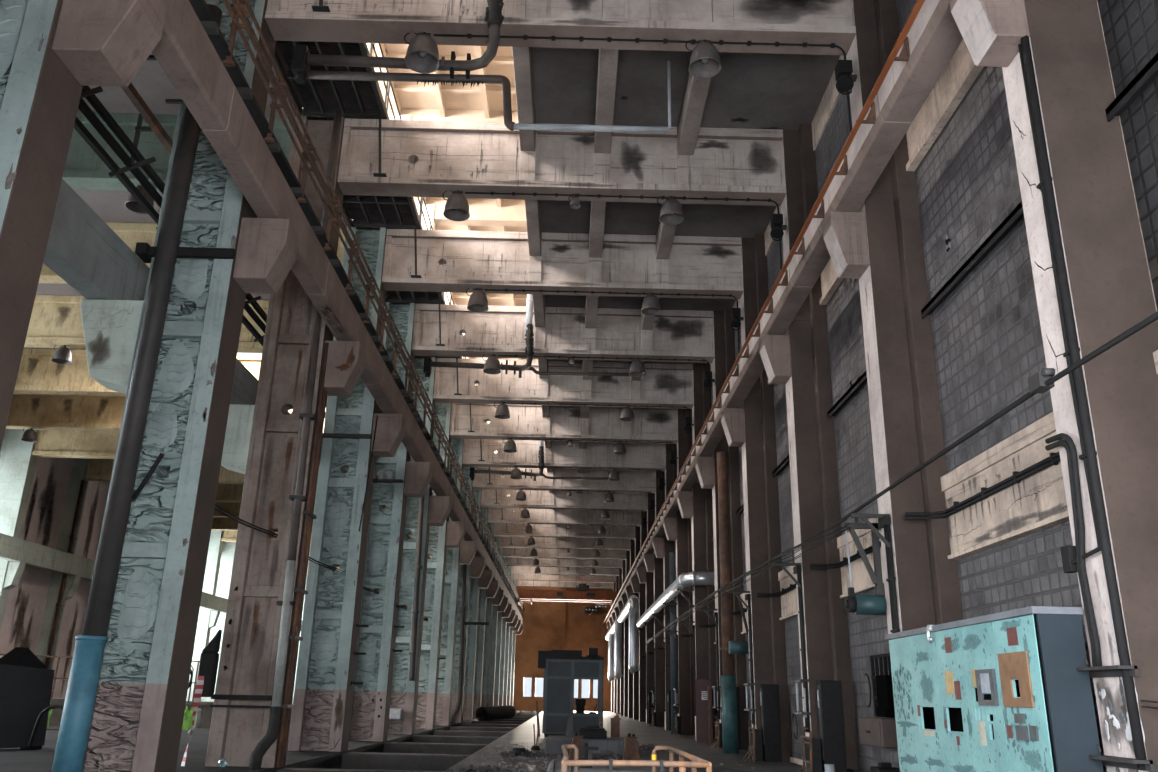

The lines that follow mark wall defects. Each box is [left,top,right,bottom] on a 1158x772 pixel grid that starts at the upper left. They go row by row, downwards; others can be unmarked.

water stain [25,474,54,546]
water stain [84,496,98,557]
water stain [977,505,1067,542]
water stain [12,590,31,648]
water stain [63,612,77,682]
peeling [1099,677,1145,749]